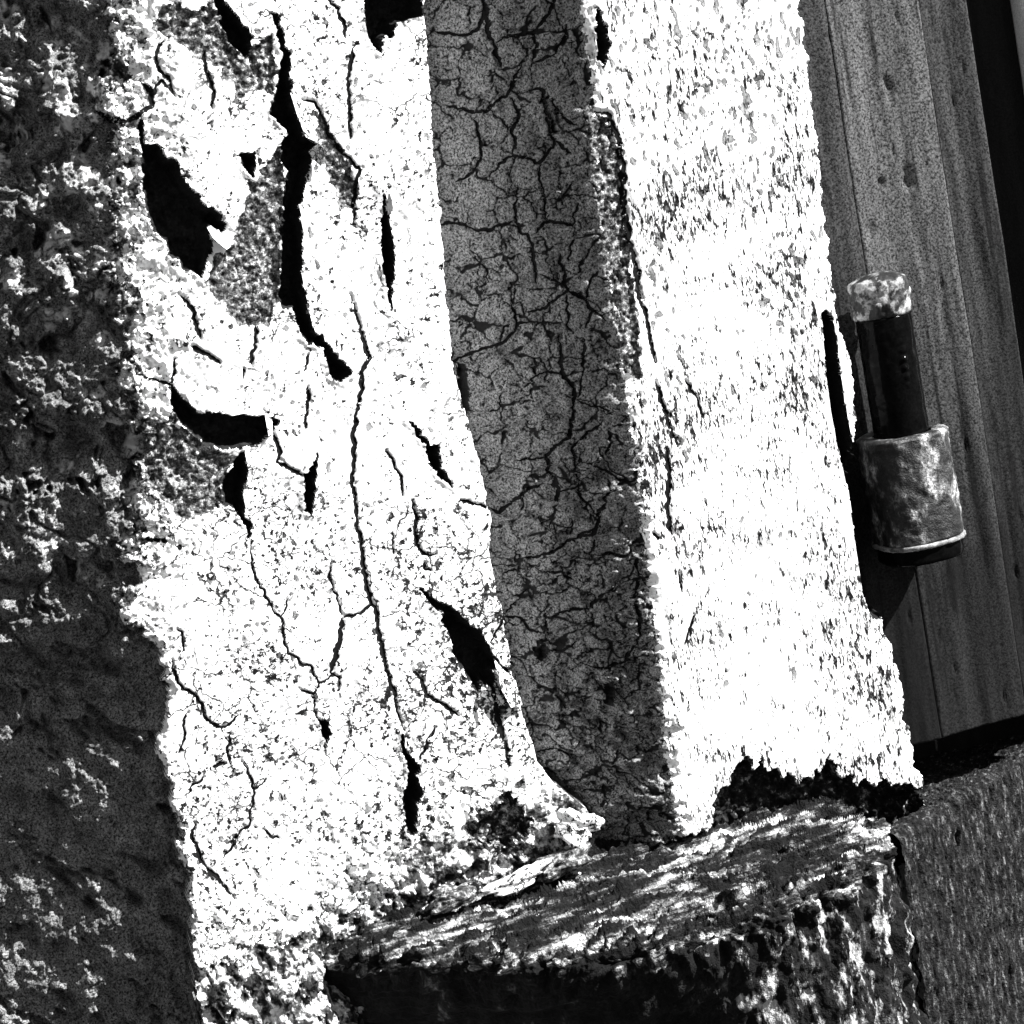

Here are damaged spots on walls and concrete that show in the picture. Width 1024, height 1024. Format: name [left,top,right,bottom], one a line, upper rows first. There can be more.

crack [95,40,175,124]
crack [135,295,259,385]
peeling [93,0,360,382]
crack [302,0,362,228]
spalling [380,190,396,310]
spalling [364,0,423,53]
crack [430,0,679,670]
peeling [110,355,281,637]
crack [250,294,459,760]
crack [171,628,279,900]
spalling [419,588,522,714]
spalling [665,754,926,845]